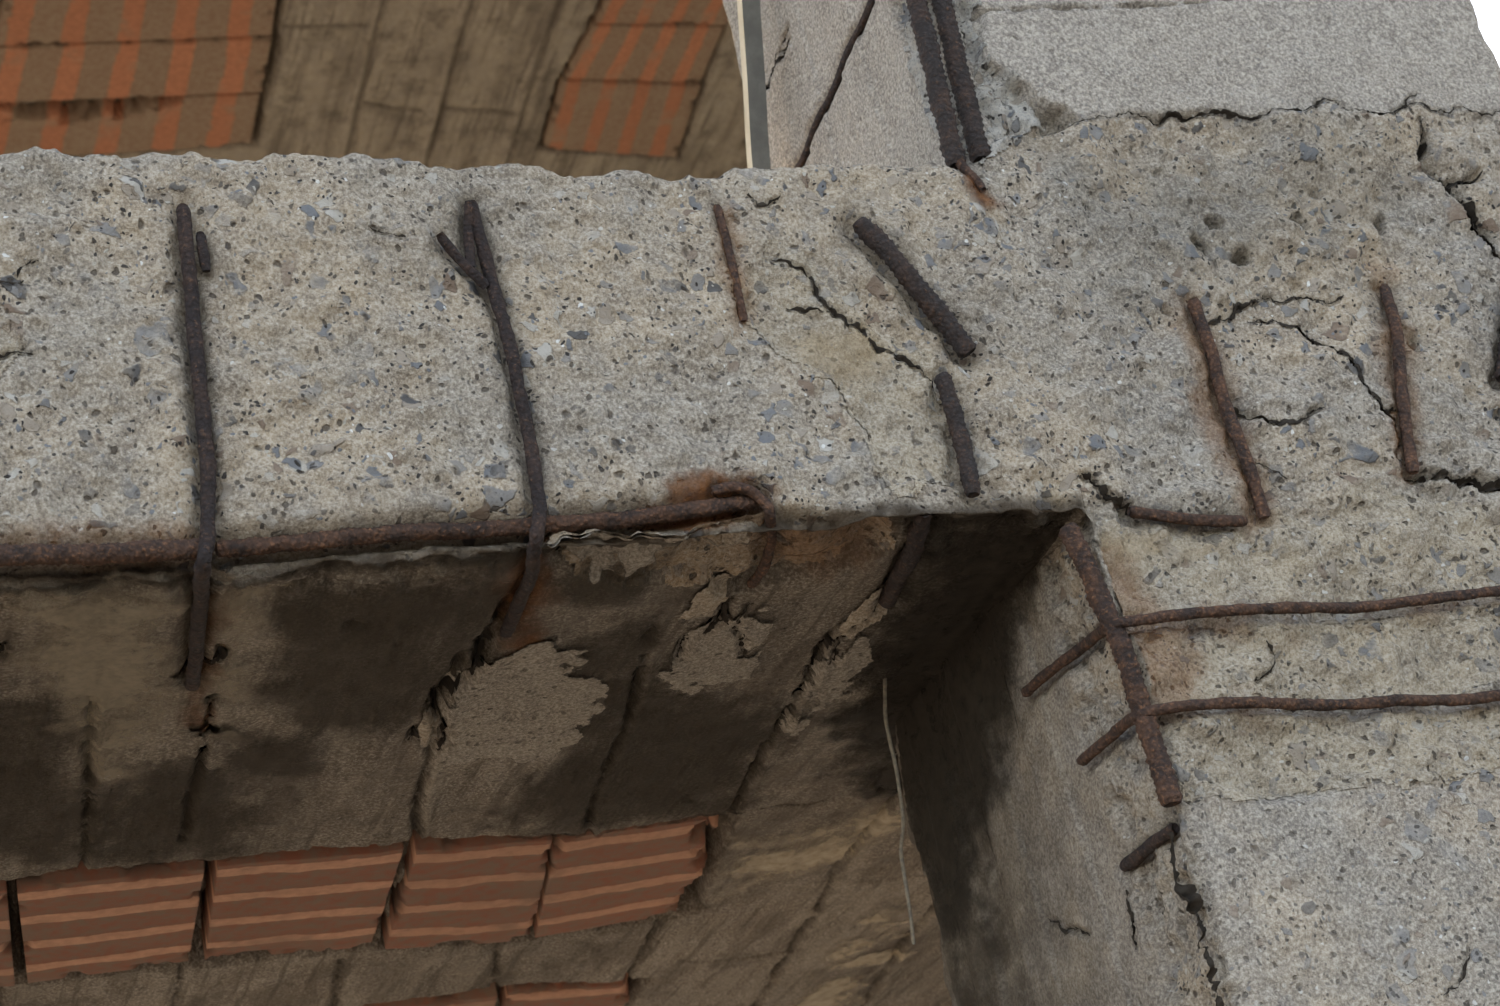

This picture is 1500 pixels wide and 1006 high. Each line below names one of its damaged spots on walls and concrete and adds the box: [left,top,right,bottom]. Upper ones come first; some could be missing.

crack [1072,93,1500,259]
spalling [733,236,951,497]
crack [772,258,942,405]
corrosion [640,471,759,532]
crack [1081,473,1135,519]
leakage [0,579,511,864]
peeling [415,641,609,768]
spalling [547,510,897,696]
peeling [779,580,887,746]
leakage [731,514,1067,963]
spalling [1100,476,1500,805]
crack [1443,948,1470,996]